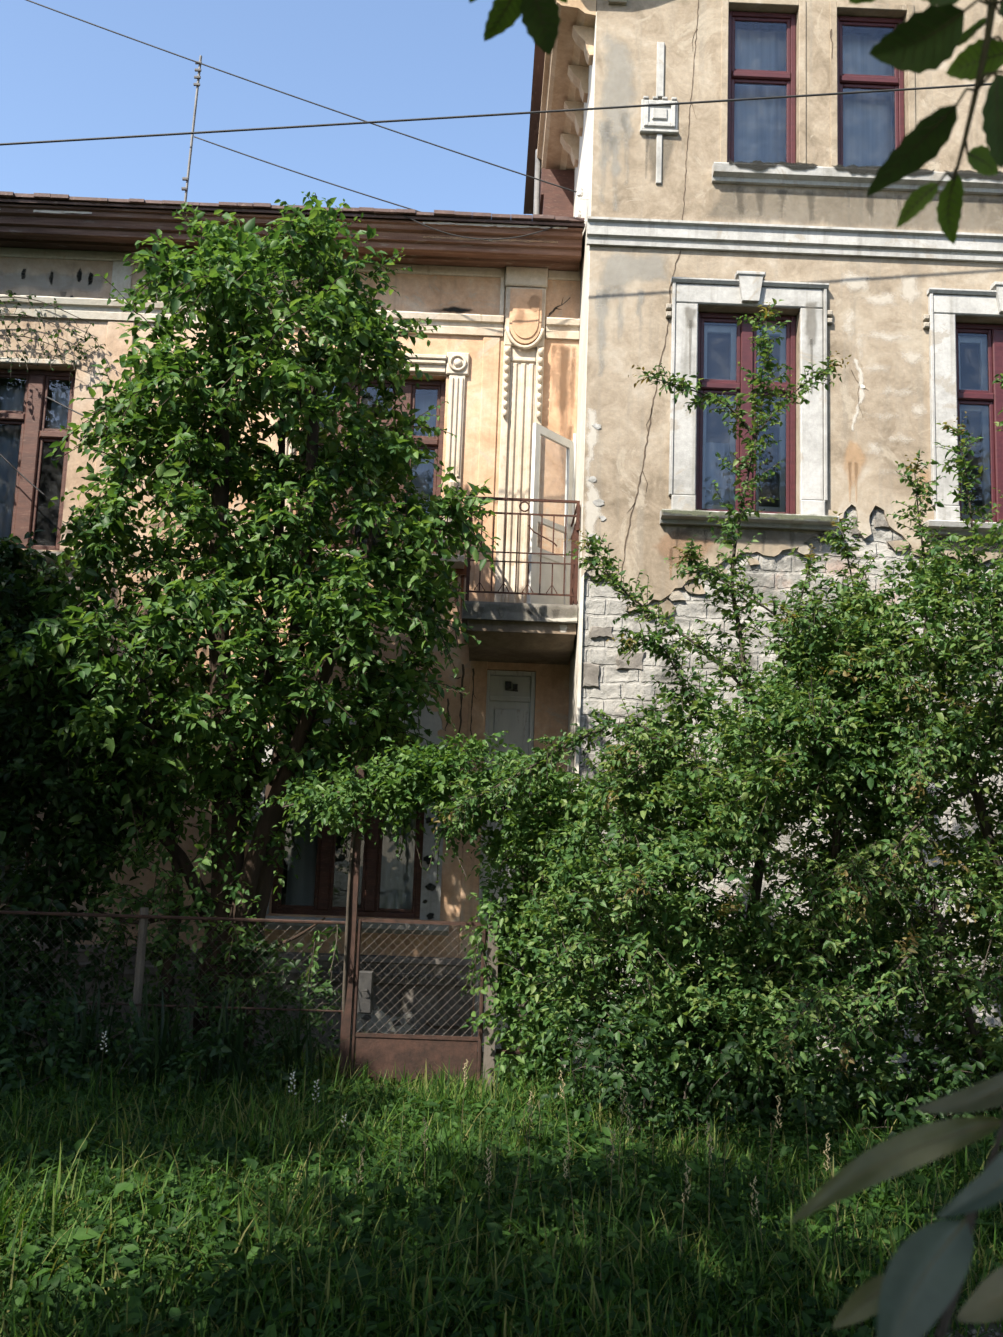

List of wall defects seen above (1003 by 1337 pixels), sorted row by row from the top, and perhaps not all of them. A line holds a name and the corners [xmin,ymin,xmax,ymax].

crack [621,0,699,580]
spalling [578,410,1003,801]
spalling [656,806,876,935]
spalling [861,735,1003,987]
spalling [356,1008,416,1034]
spalling [853,992,1003,1083]